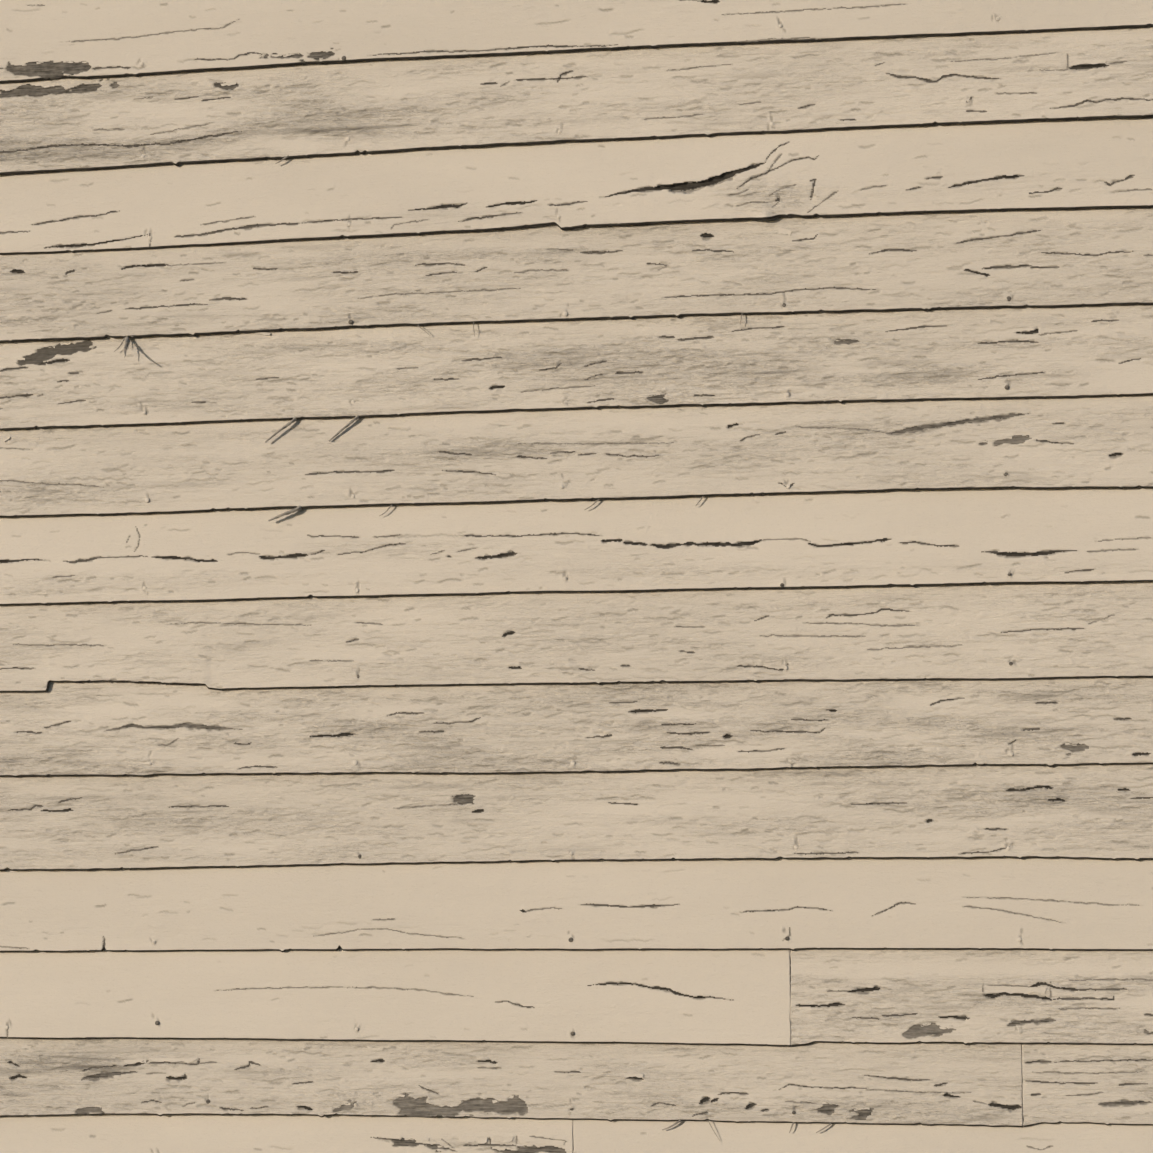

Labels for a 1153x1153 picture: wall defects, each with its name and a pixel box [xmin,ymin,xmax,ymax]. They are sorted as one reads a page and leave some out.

peeling [0,60,120,98]
crack [3,142,1062,314]
peeling [18,340,97,366]
crack [0,526,1151,578]
peeling [452,792,484,813]
crack [587,982,734,1000]
peeling [903,1023,956,1038]
peeling [394,1093,528,1117]
peeling [392,1136,566,1153]